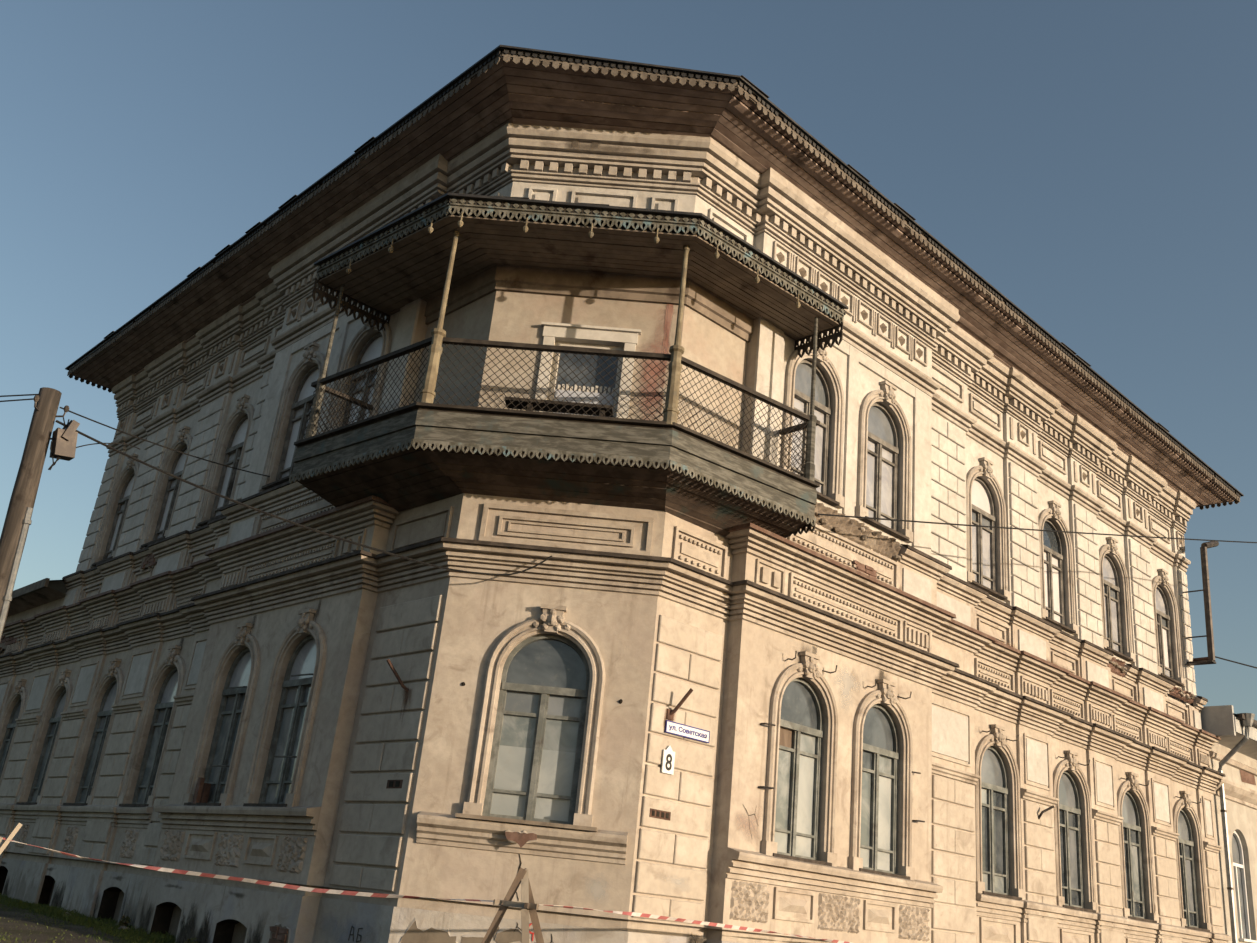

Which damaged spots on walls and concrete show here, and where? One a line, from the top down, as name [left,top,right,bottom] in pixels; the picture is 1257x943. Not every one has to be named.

flaking render [268,923,291,943]
spalling [398,917,536,943]